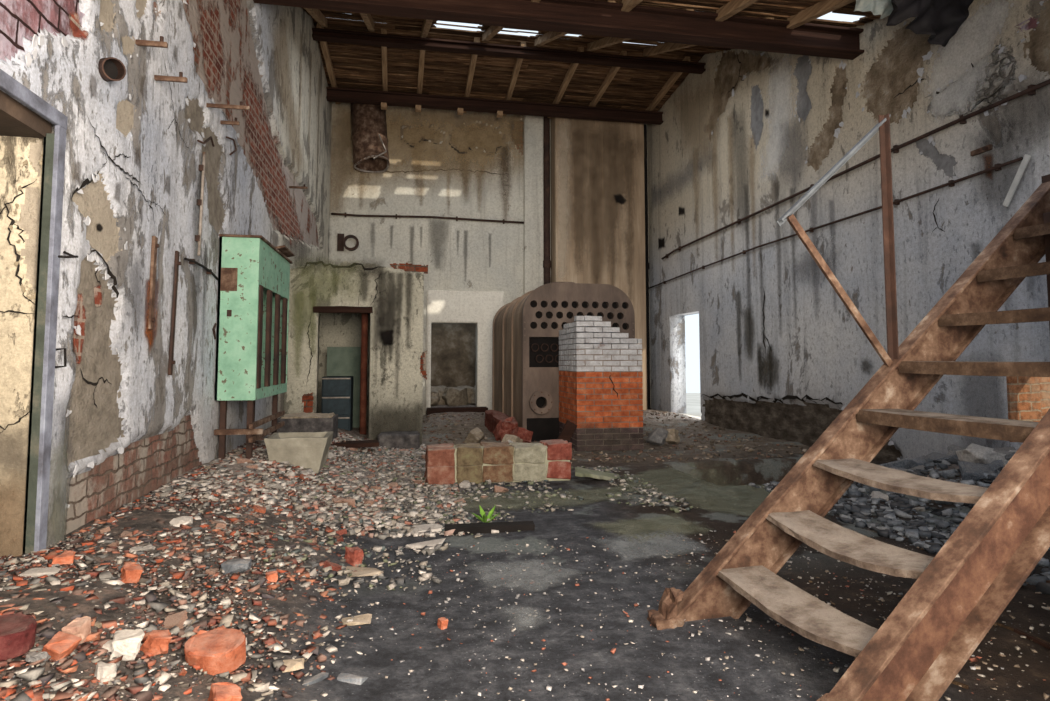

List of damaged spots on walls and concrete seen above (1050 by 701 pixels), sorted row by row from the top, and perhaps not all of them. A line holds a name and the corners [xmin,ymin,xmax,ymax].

flaking render [0,0,141,68]
crack [71,116,164,224]
flaking render [181,0,320,249]
flaking render [705,50,779,151]
leakage [766,63,791,172]
flaking render [805,21,933,172]
leakage [932,2,1006,114]
crack [0,179,37,314]
flaking render [63,170,202,536]
leakage [296,260,411,353]
leakage [737,293,777,386]
crack [0,411,30,433]